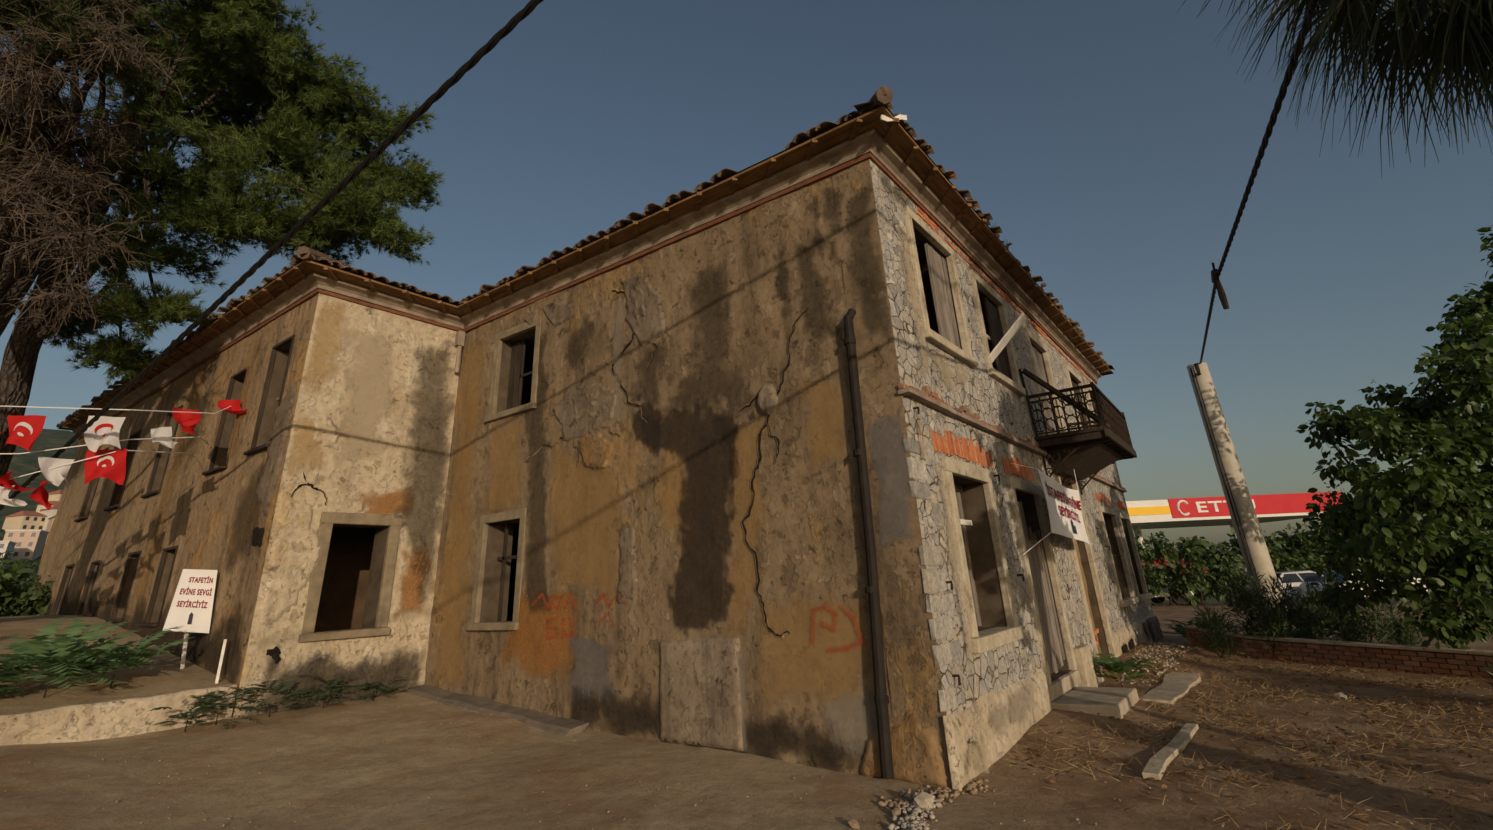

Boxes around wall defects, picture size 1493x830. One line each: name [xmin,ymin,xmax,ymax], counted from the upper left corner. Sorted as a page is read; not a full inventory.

crack [522,333,658,469]
leakage [633,273,758,629]
crack [740,309,807,638]